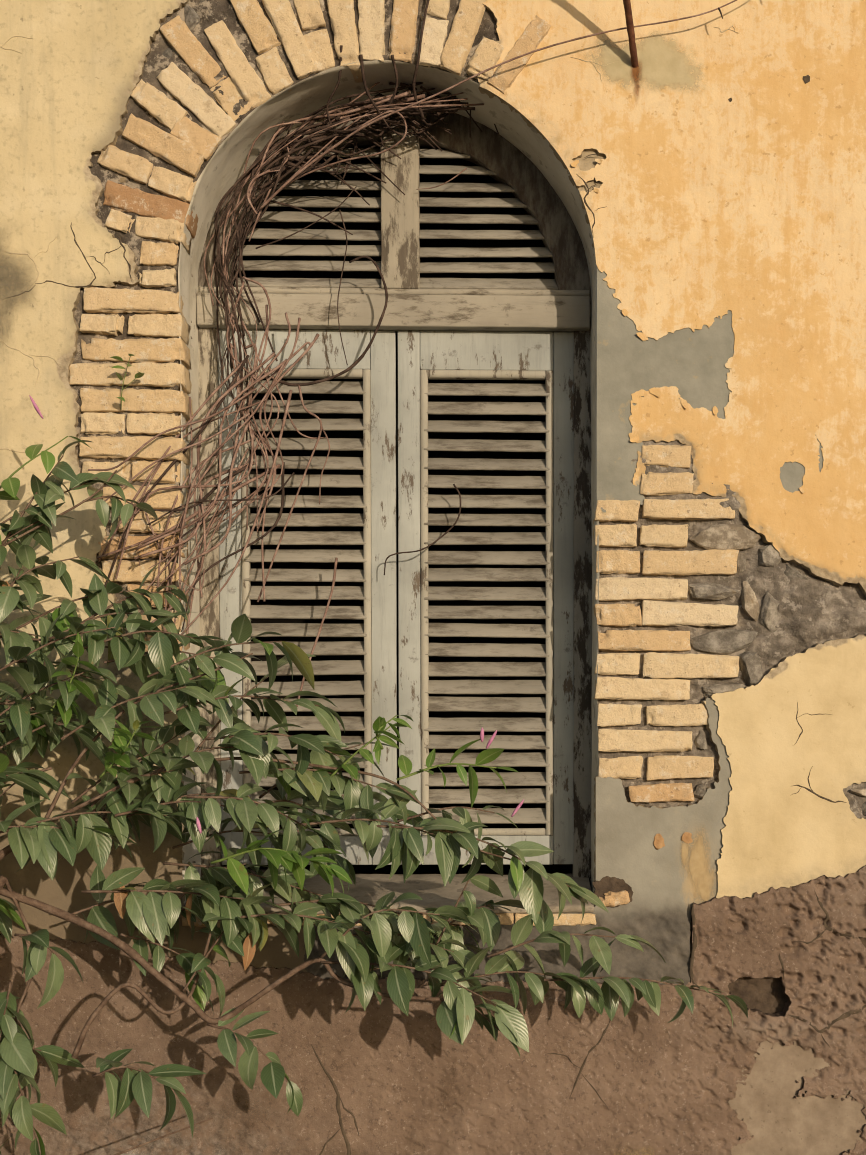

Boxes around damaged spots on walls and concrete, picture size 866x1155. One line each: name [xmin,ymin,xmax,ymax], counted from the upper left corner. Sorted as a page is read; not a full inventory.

rust [632,63,640,91]
peeling [571,150,606,193]
crack [2,222,133,300]
flaking render [69,0,551,655]
flaking render [593,267,866,807]
crack [795,702,831,744]
crack [790,766,847,803]
flaking render [843,782,866,818]
spalling [654,833,665,850]
spalling [592,876,634,908]
flaking render [728,1038,866,1155]